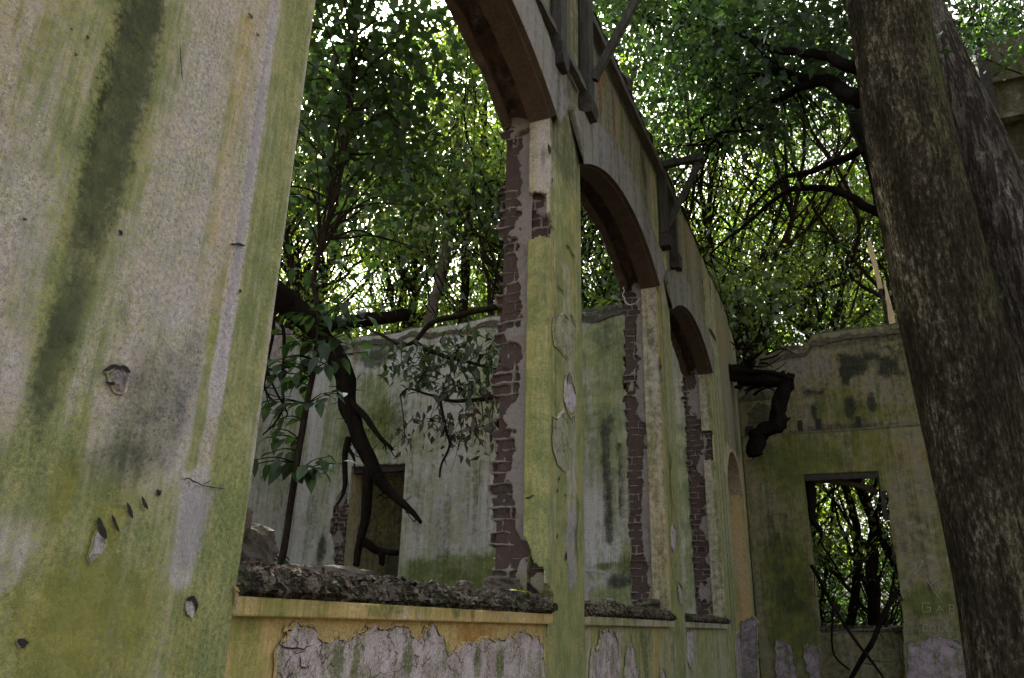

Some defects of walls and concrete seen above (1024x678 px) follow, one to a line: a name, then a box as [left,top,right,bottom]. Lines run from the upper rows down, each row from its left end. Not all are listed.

damp [27,0,165,441]
flaking render [102,363,131,394]
damp [839,351,905,419]
flaking render [87,515,119,564]
flaking render [185,596,198,618]
peeling [273,620,546,678]
peeling [589,628,640,678]
peeling [774,639,822,678]
peeling [905,635,966,678]